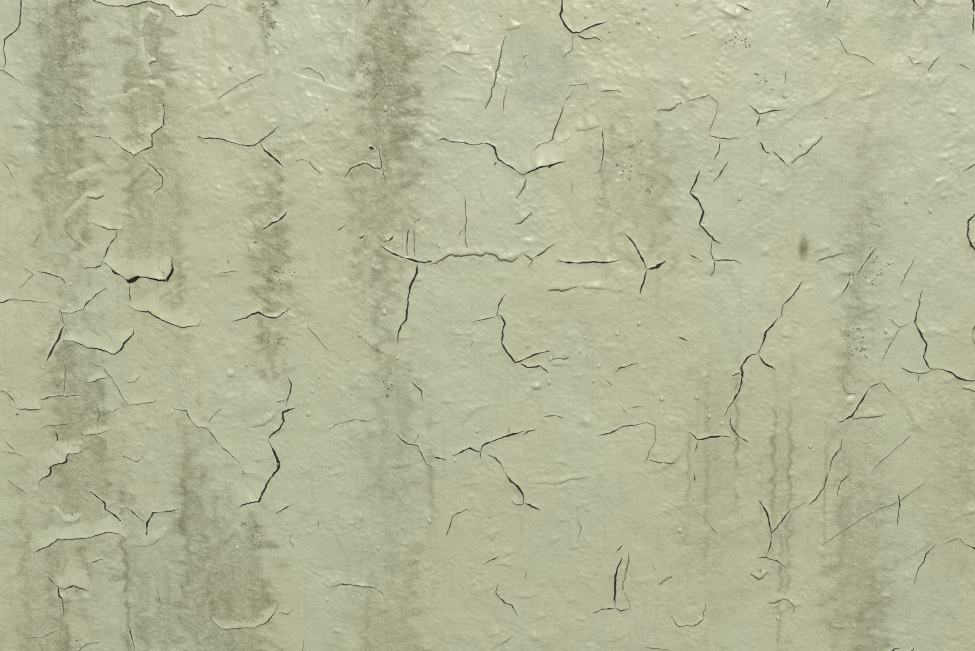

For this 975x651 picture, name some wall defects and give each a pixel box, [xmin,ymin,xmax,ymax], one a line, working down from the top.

crack [435,82,623,194]
peeling [518,142,565,174]
crack [521,69,790,297]
peeling [62,326,134,354]
peeling [82,216,201,328]
crack [335,216,437,345]
crack [469,290,551,376]
peeling [174,376,298,507]
crack [394,412,565,514]
crack [755,255,975,570]
peeling [27,515,132,554]
peeling [211,604,295,630]